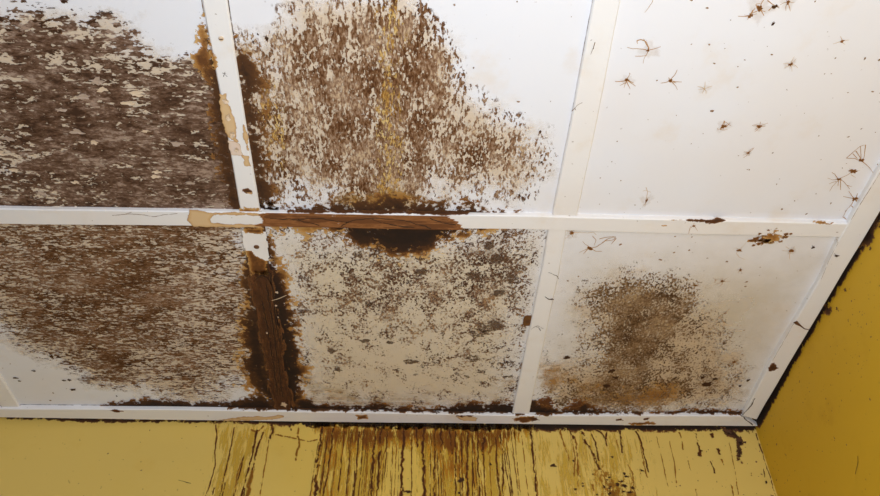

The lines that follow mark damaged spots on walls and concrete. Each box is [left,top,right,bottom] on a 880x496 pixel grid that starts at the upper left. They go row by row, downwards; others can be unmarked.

damp [0,0,240,209]
peeling [219,94,251,166]
damp [233,0,558,213]
peeling [187,209,469,276]
damp [0,224,866,496]
peeling [722,427,746,464]